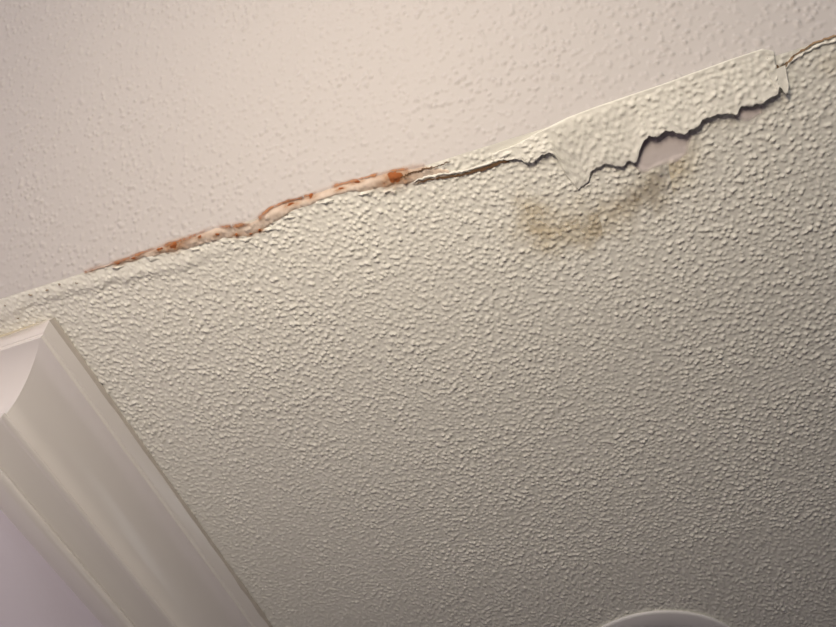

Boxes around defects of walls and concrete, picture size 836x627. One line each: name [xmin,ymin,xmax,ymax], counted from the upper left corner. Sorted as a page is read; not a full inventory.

crack [776,35,836,69]
peeling [491,49,789,190]
corrosion [333,168,405,191]
crack [400,156,514,184]
corrosion [258,193,313,219]
corrosion [216,223,262,237]
corrosion [114,232,202,264]